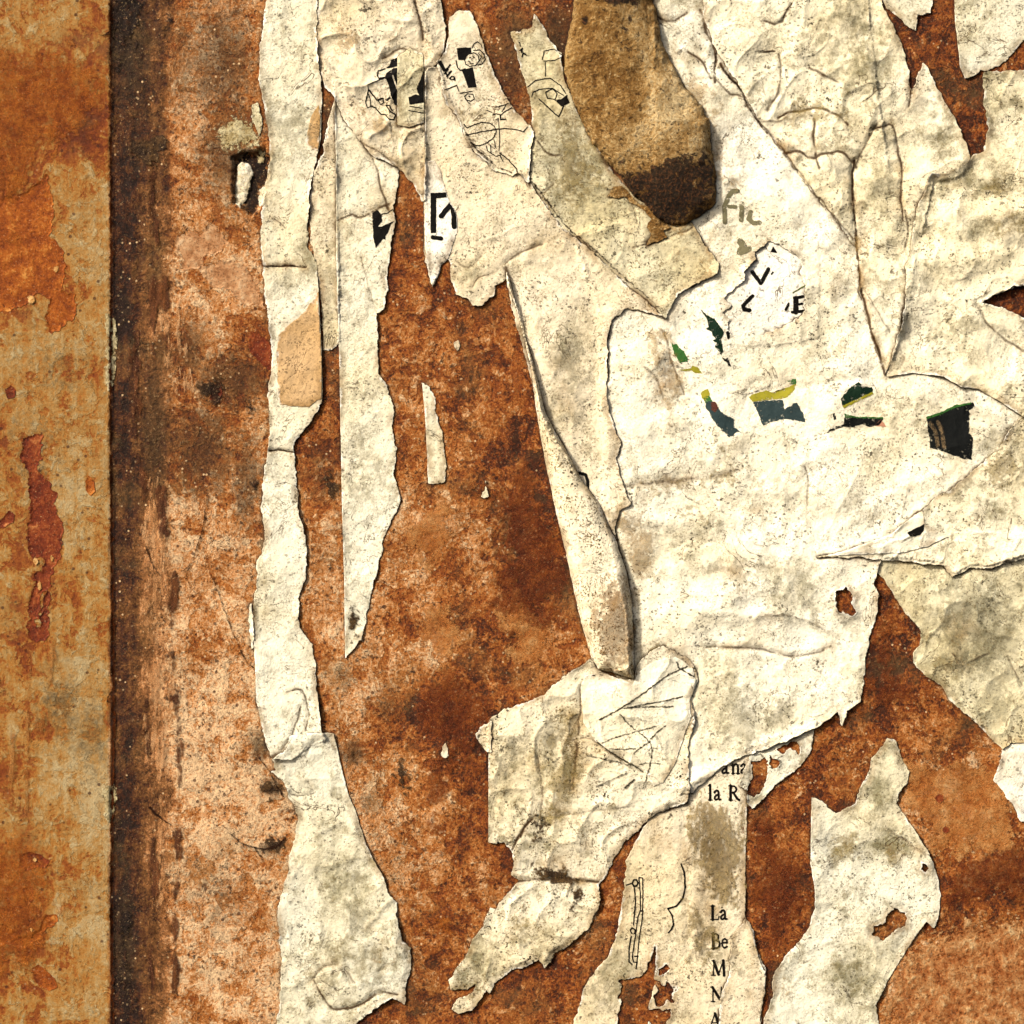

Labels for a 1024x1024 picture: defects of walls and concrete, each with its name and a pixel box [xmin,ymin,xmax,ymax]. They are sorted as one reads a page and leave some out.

spalling [230,148,270,214]
leakage [104,130,172,438]
leakage [139,468,170,538]
rust [469,462,568,631]
leakage [167,570,179,627]
flaking render [493,592,559,685]
leakage [169,684,183,786]
rust [420,671,491,803]
flaking render [903,753,1015,862]
rust [944,845,1024,910]
leakage [169,916,181,992]
spalling [879,913,1024,1024]